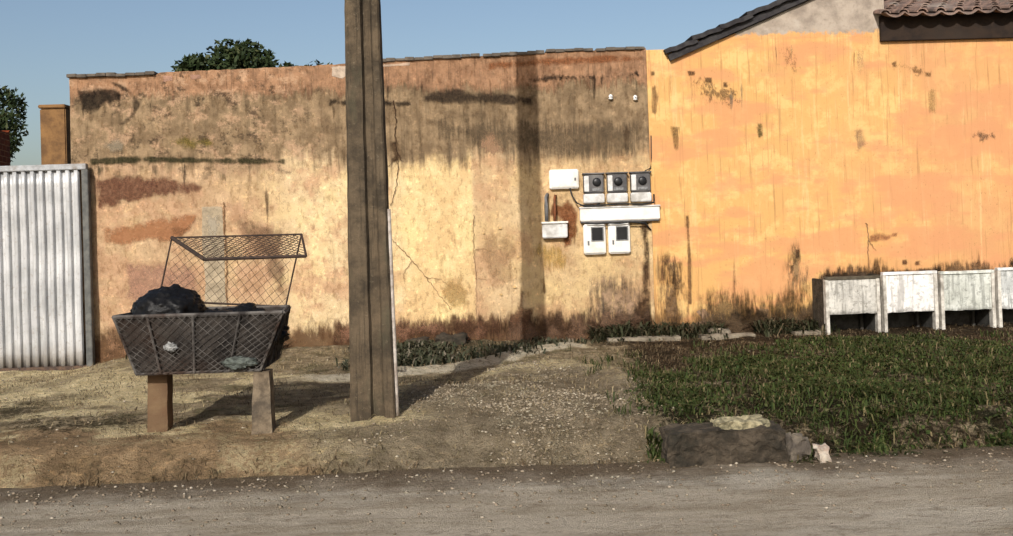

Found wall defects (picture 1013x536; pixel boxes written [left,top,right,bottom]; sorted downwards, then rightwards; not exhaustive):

leakage [421,84,531,104]
leakage [534,75,607,89]
crack [389,100,402,206]
leakage [438,120,637,157]
corrosion [551,202,577,246]
crack [392,215,495,310]
leakage [396,216,813,343]
leakage [819,259,1013,279]
leakage [333,321,349,345]